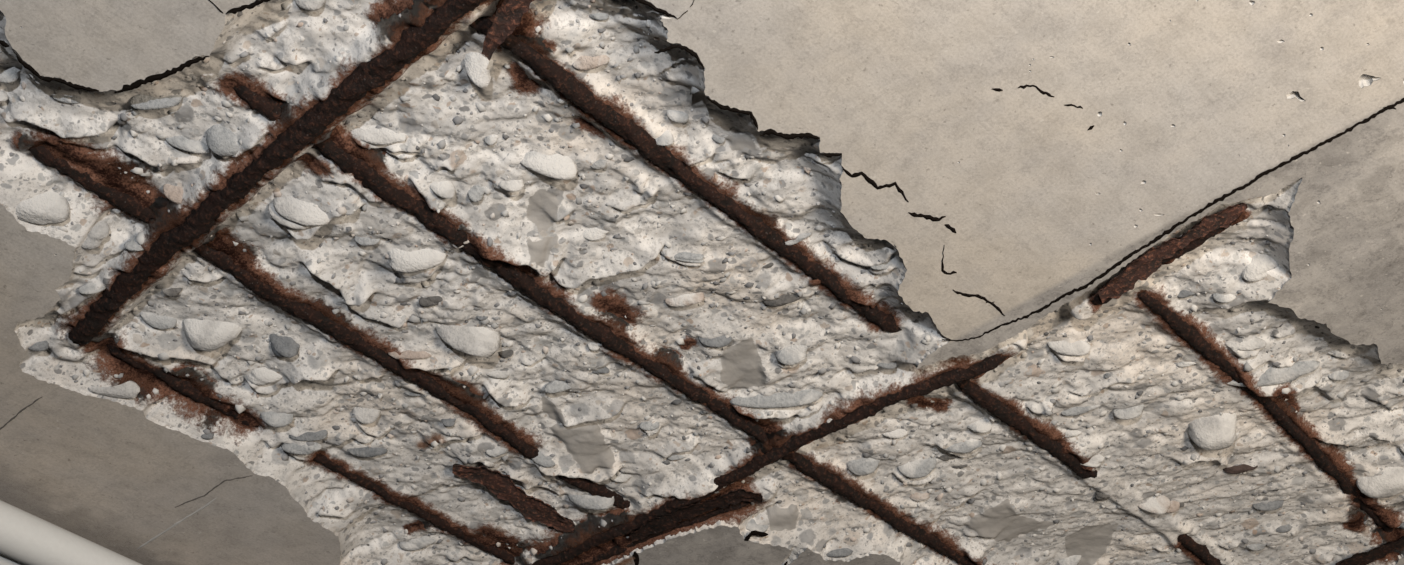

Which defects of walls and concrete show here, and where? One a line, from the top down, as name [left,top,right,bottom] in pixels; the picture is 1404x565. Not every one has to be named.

crack [0,40,209,93]
crack [209,0,270,14]
spalling [0,0,958,565]
rust [11,0,1094,565]
crack [636,0,1404,341]
spalling [795,178,1404,565]
rust [1088,203,1404,565]
spalling [1286,91,1305,102]
spalling [1359,74,1380,88]